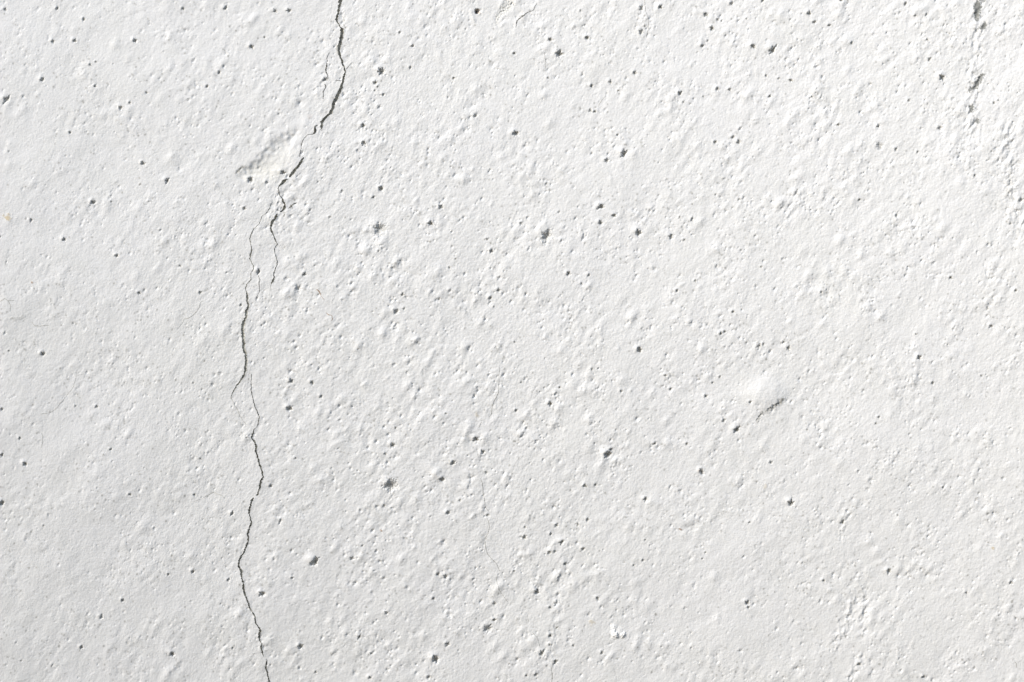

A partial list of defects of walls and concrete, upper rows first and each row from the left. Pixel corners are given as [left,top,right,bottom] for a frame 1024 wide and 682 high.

crack [196,0,349,682]